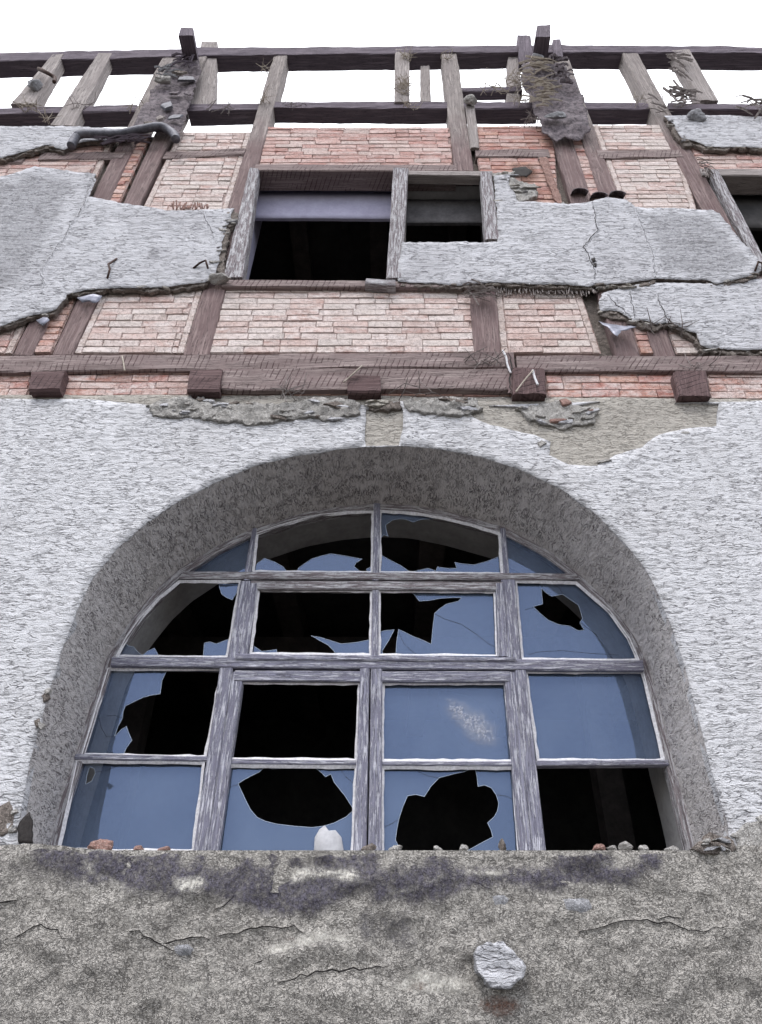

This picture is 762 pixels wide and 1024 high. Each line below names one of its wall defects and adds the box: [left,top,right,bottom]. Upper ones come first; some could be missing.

spalling [492,156,566,204]
peeling [218,219,238,234]
crack [582,201,600,284]
spalling [145,396,723,466]
damp [35,849,661,914]
crack [129,895,305,954]
crack [578,913,728,934]
crack [254,958,385,985]